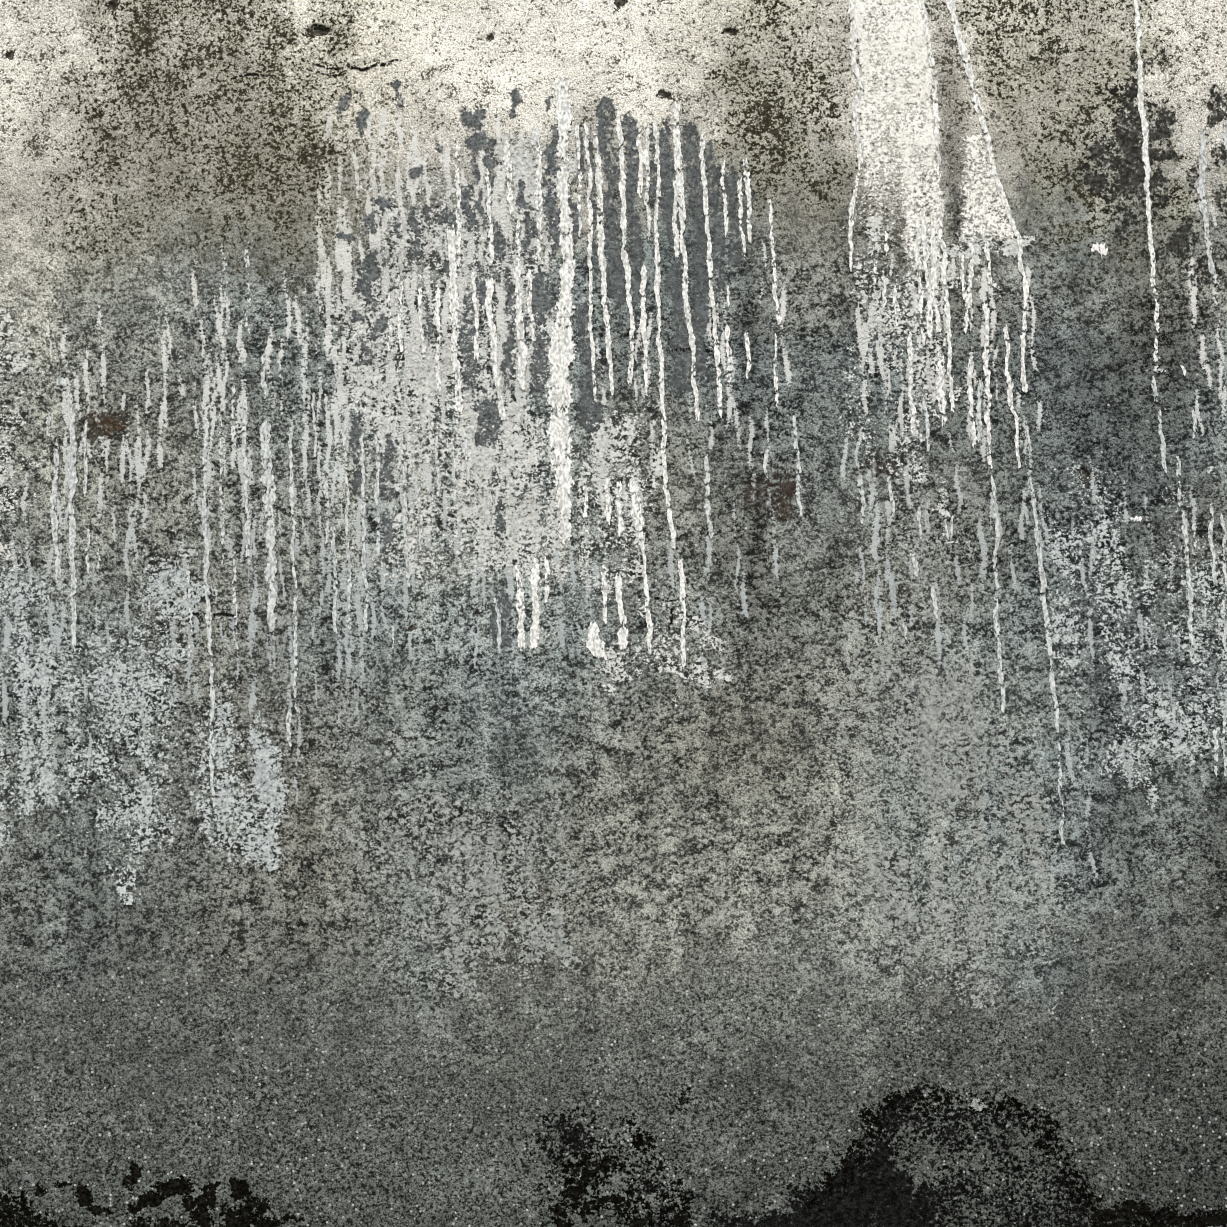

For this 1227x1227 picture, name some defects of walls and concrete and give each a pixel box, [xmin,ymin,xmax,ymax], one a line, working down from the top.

water stain [0,293,310,905]
water stain [319,75,733,695]
water stain [699,133,752,417]
water stain [767,197,782,407]
water stain [792,415,803,516]
water stain [817,0,1227,1009]
efflorescence [315,657,588,1001]
water stain [0,1162,304,1227]
water stain [507,1083,1226,1227]
crack [1194,1211,1227,1226]